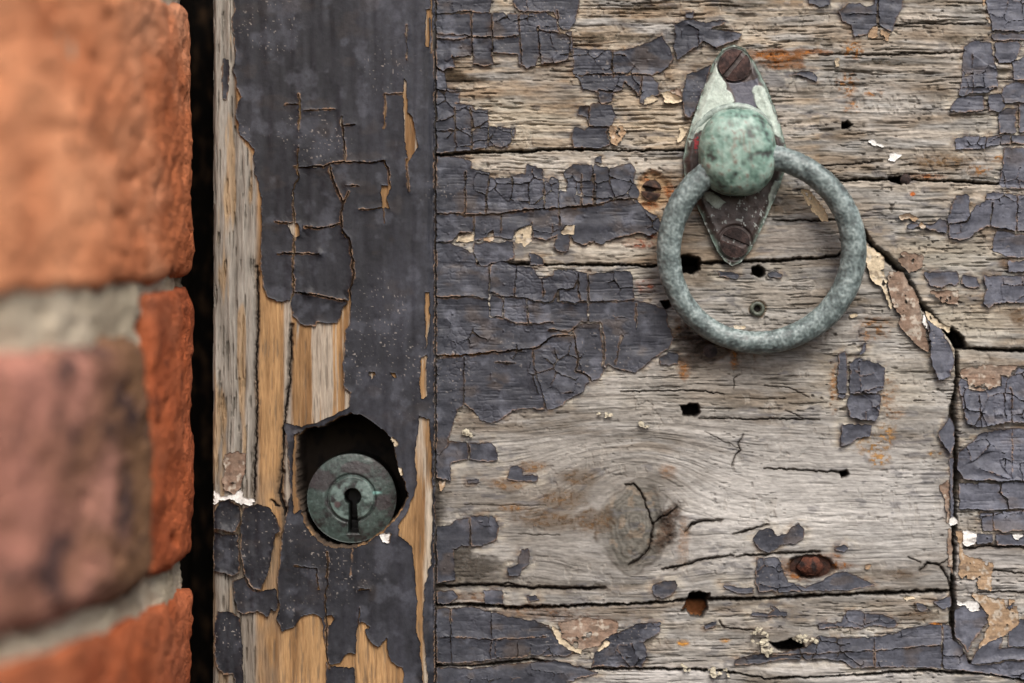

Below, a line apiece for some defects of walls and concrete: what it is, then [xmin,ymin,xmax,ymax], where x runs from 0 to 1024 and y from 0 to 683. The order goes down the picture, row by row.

crack [278,97,390,302]
peeling [899,0,1024,308]
peeling [213,0,742,683]
crack [631,483,815,570]
peeling [723,523,875,594]
crack [769,466,840,474]
peeling [708,593,1024,679]
peeling [922,311,1024,573]